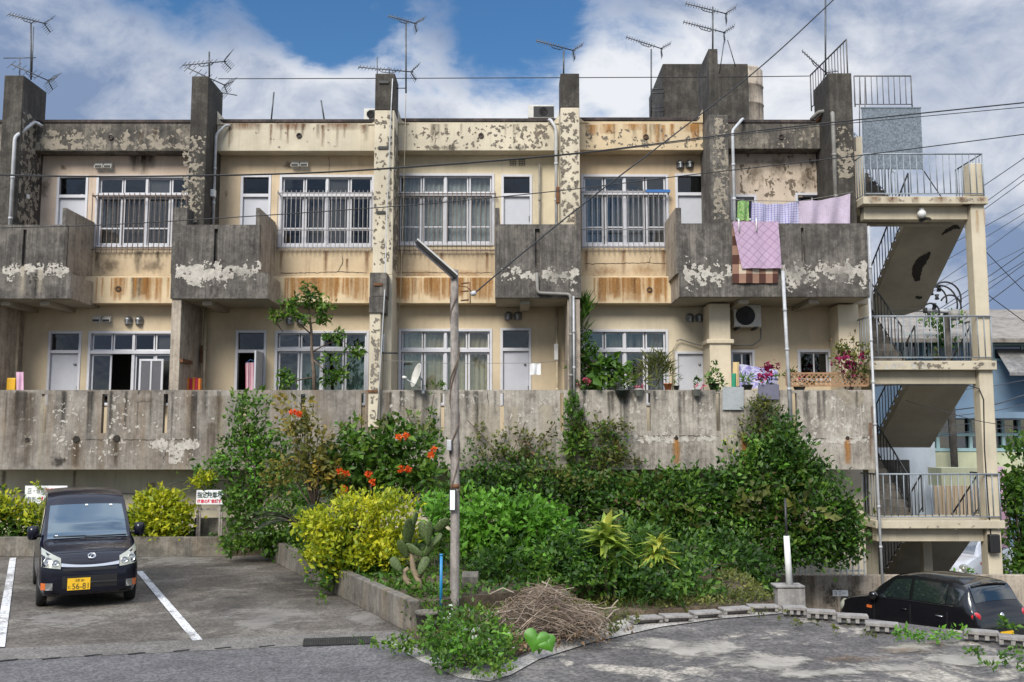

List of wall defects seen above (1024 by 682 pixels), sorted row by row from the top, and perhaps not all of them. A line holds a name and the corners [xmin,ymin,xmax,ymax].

peeling [17,112,206,225]
spalling [373,112,729,273]
peeling [2,262,69,283]
corrosion [102,278,169,293]
peeling [175,259,261,289]
corrosion [285,278,367,298]
corrosion [397,278,492,298]
peeling [501,266,579,291]
corrosion [594,278,667,298]
peeling [683,256,732,292]
peeling [781,258,867,293]
peeling [52,395,218,464]